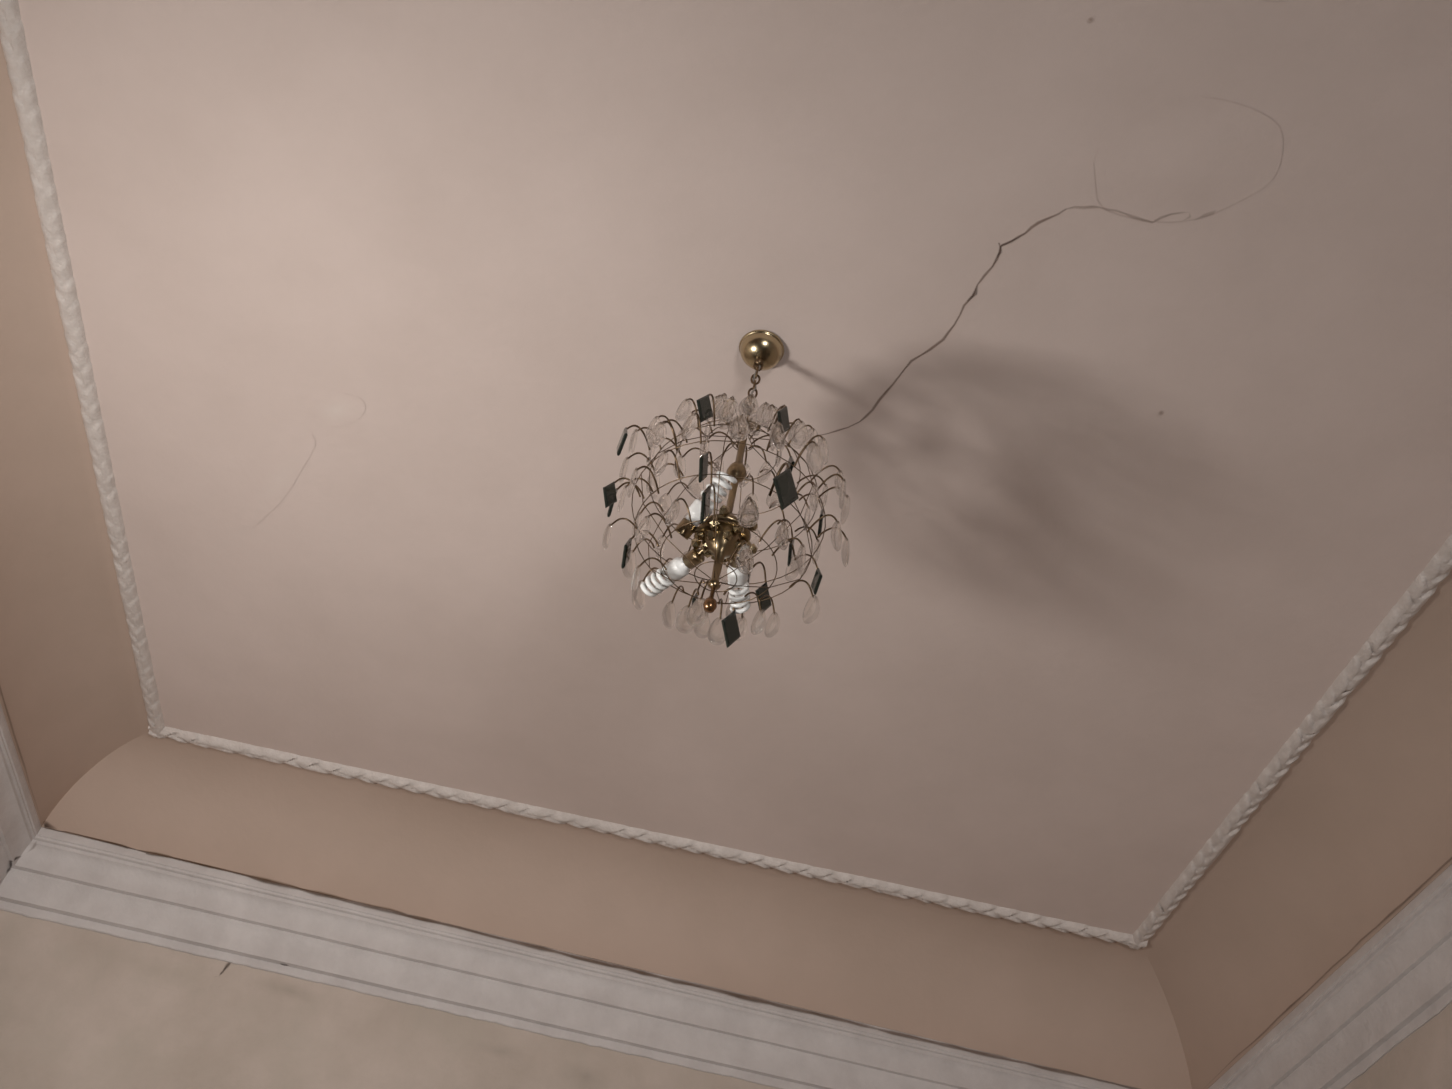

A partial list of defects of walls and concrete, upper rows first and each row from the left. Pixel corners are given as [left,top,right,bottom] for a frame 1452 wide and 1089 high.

crack [822,217,1050,435]